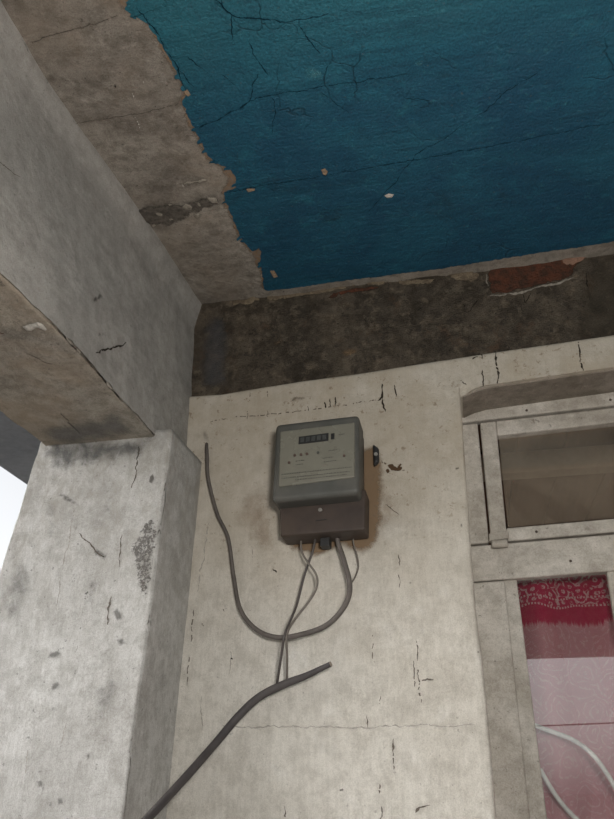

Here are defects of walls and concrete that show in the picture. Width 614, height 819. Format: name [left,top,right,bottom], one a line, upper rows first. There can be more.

crack [34,15,117,42]
crack [82,0,402,131]
peeling [154,34,278,289]
crack [225,73,614,211]
spalling [488,260,579,293]
spalling [23,322,47,331]
crack [56,508,122,606]
crack [183,523,209,682]
crack [413,641,433,702]
crack [223,696,471,768]